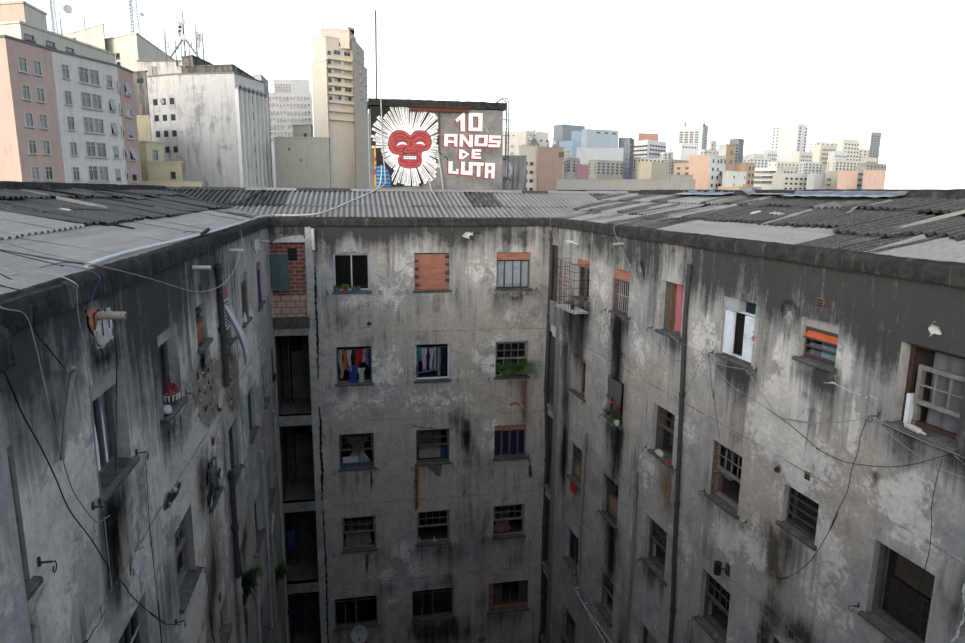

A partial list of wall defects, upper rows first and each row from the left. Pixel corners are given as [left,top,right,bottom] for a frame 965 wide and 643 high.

crack [313,266,326,379]
flaking render [196,354,238,427]
crack [319,407,330,643]
damp [768,528,781,582]